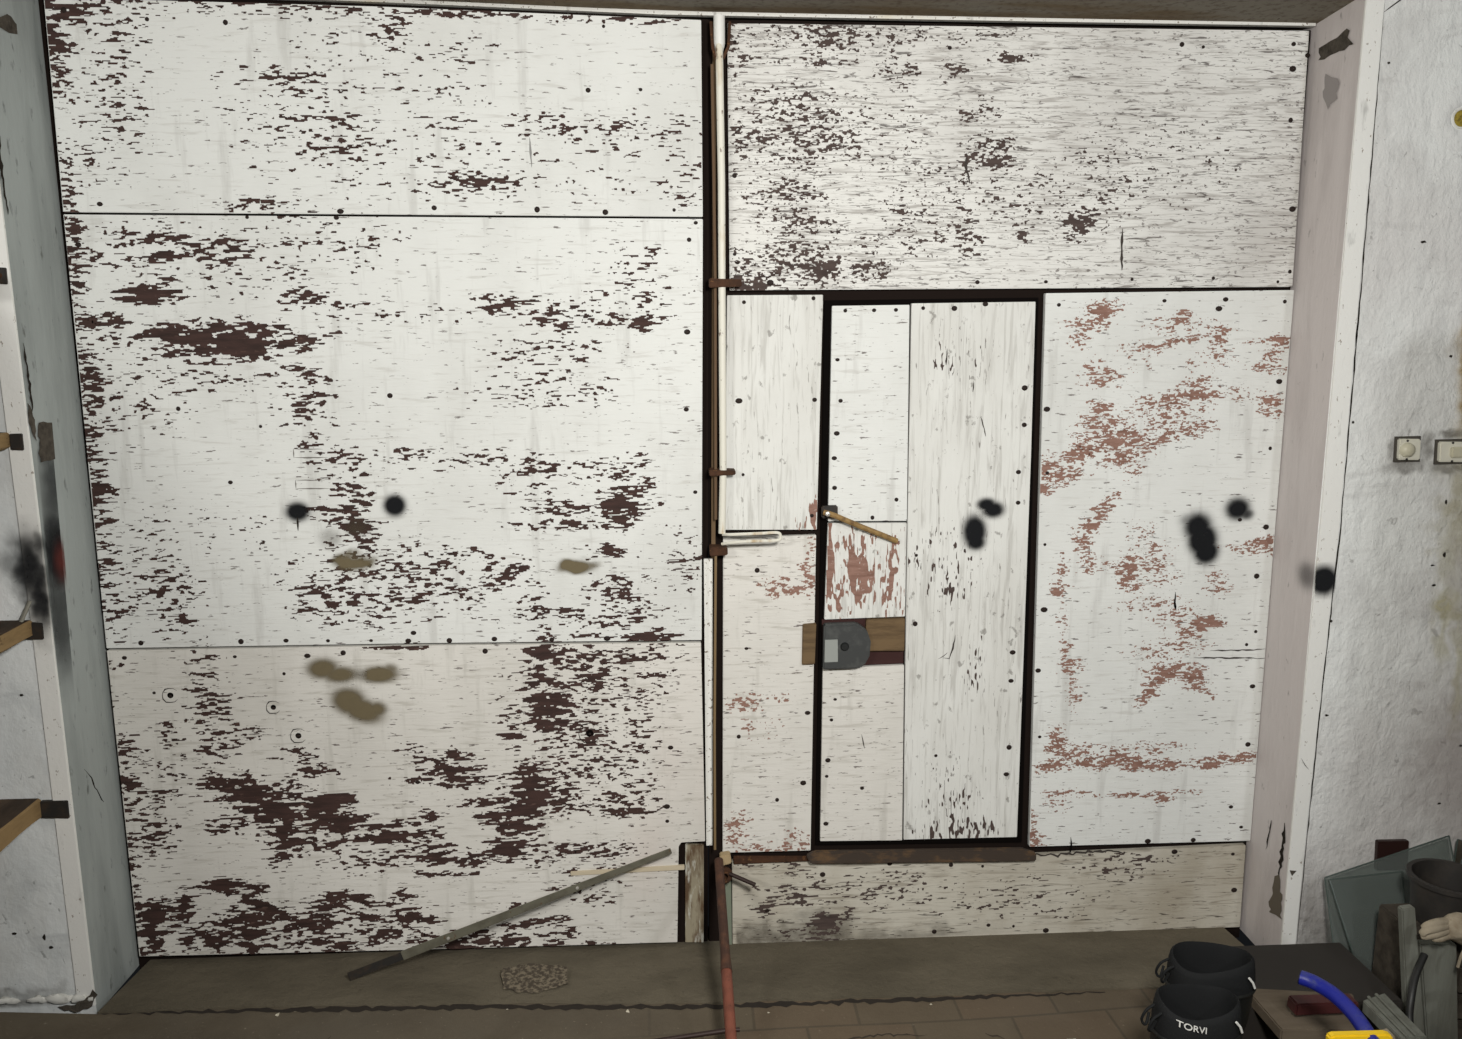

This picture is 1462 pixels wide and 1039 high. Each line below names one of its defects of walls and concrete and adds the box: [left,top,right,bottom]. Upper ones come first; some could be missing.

peeling [728,23,1240,291]
peeling [45,0,702,993]
peeling [1030,298,1291,847]
peeling [723,809,1179,942]